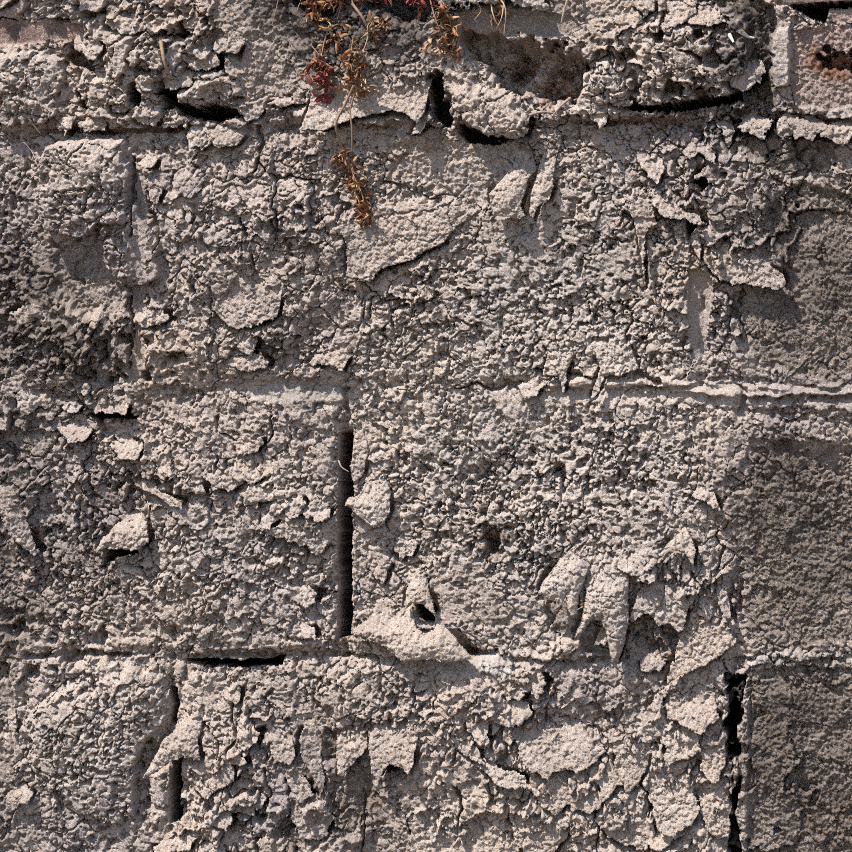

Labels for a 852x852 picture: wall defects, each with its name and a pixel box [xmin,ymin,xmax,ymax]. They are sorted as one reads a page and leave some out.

crack [125,156,161,255]
crack [238,218,254,264]
crack [250,124,317,251]
crack [384,180,460,201]
crack [125,295,136,369]
crack [356,278,442,322]
peeling [0,474,40,556]
peeling [96,507,149,553]
peeling [134,430,852,852]
peeling [7,704,18,737]
peeling [4,780,34,804]
crack [202,702,273,840]